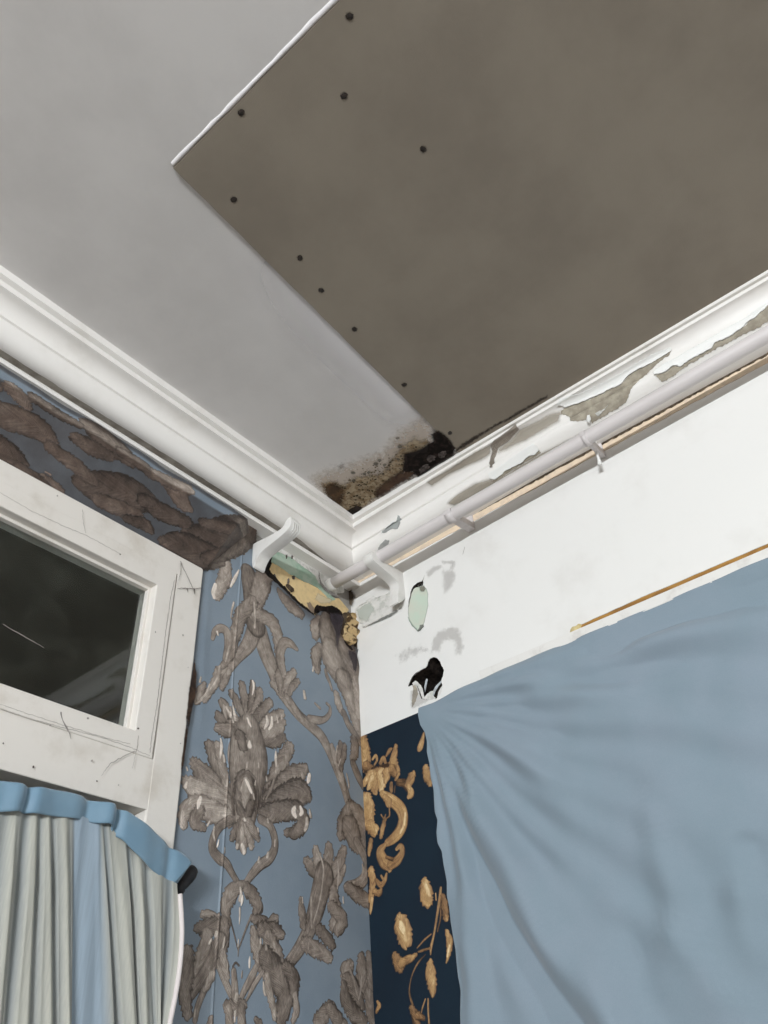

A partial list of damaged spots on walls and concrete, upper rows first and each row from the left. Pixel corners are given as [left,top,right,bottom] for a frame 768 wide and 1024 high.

peeling [557,300,768,423]
water stain [322,437,429,515]
spalling [403,431,455,477]
flaking render [473,353,768,521]
peeling [378,516,402,550]
flaking render [389,525,460,566]
flaking render [265,549,349,616]
peeling [408,575,428,631]
spalling [408,658,444,707]